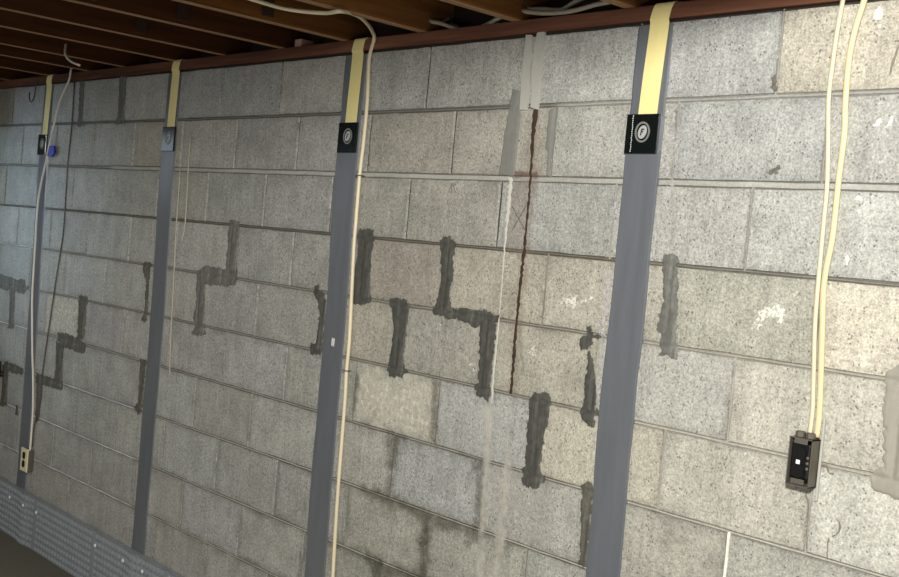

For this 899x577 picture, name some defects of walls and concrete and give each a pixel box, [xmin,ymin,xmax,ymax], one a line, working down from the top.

crack [509,110,538,394]